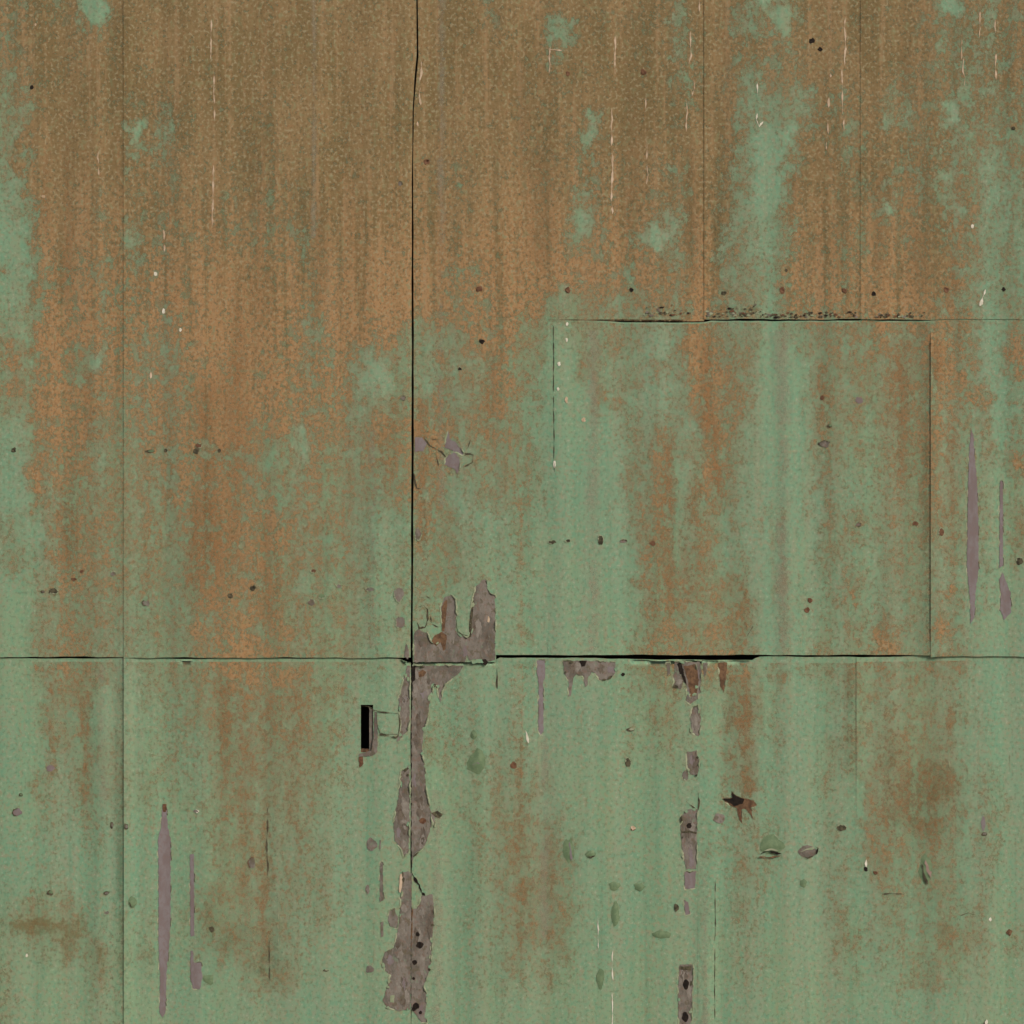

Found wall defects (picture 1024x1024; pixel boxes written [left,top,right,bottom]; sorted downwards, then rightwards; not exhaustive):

peeling [966,430,980,624]
peeling [998,480,1024,620]
peeling [365,578,497,1024]
peeling [535,658,546,736]
peeling [562,659,618,696]
peeling [681,750,700,782]
rust [702,663,756,795]
peeling [713,791,757,823]
peeling [157,804,173,1017]
peeling [674,808,699,916]
peeling [677,964,695,1024]